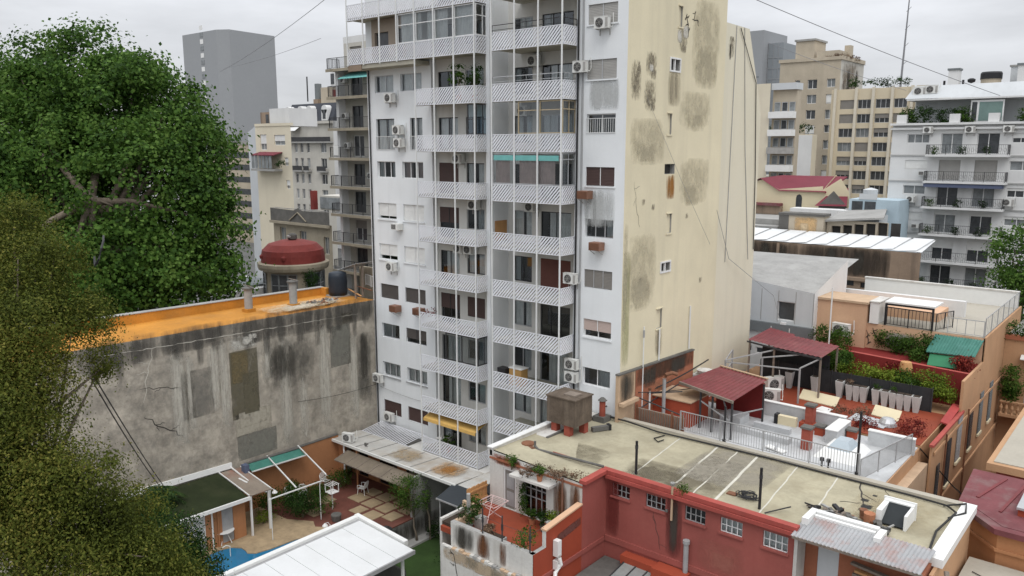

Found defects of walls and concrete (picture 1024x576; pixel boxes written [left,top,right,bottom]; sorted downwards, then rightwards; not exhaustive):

crack [83,314,352,436]
leakage [240,300,371,437]
rust [478,536,506,564]
leakage [667,500,681,553]